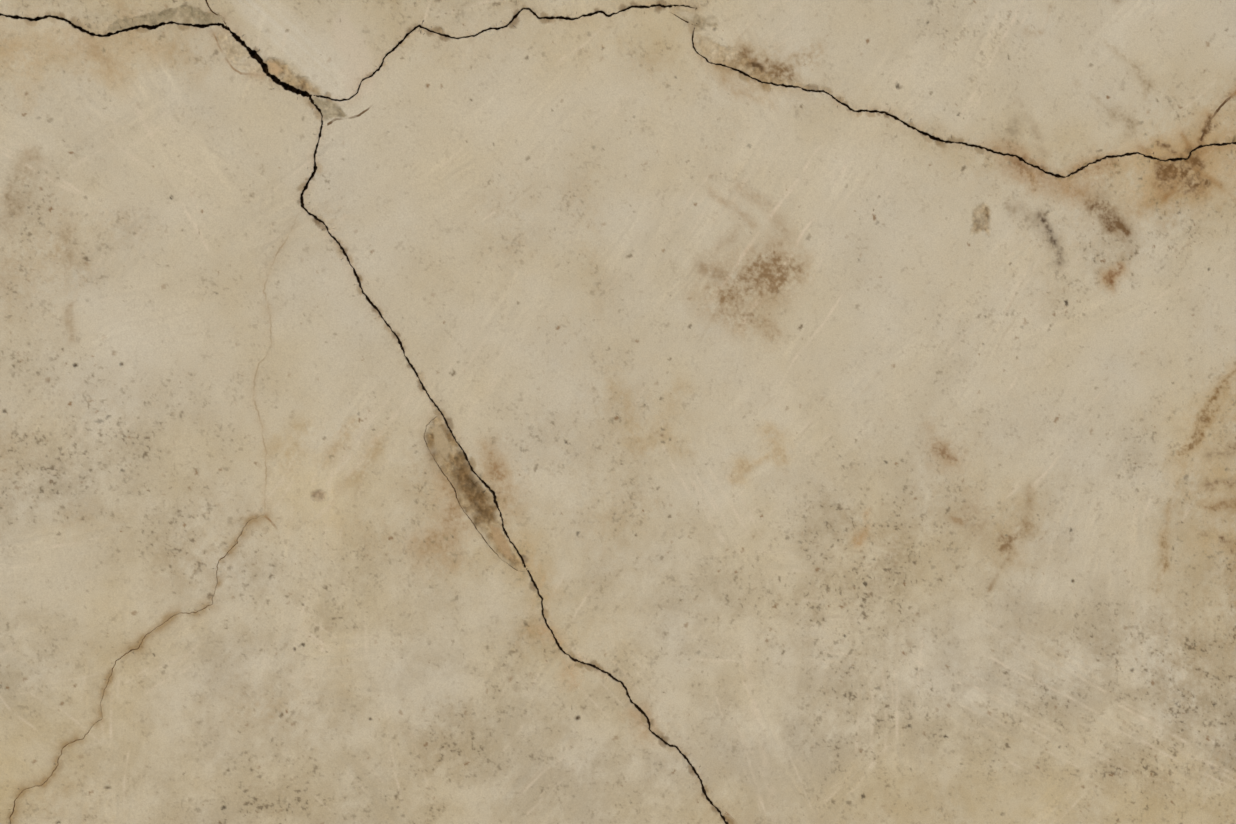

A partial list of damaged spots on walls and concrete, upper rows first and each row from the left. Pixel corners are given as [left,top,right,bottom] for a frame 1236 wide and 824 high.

crack [0,0,1236,183]
crack [3,94,736,824]
spalling [417,410,529,578]